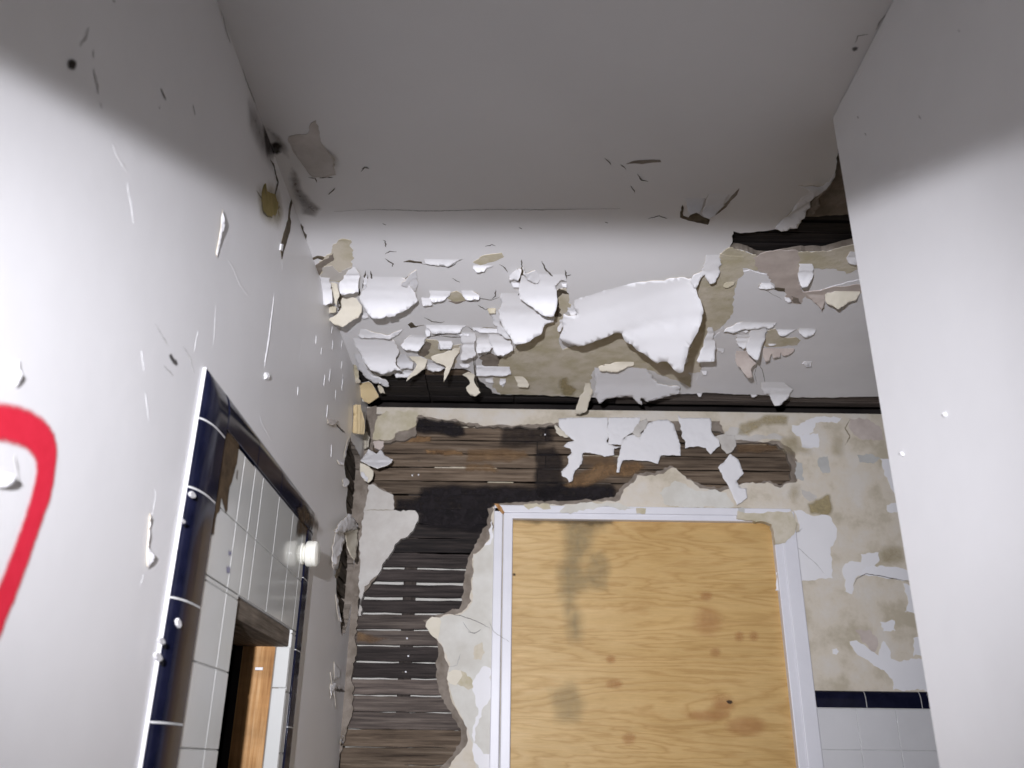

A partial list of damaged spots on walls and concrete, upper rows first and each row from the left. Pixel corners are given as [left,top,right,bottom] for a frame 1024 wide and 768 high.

water stain [253,119,281,154]
peeling [280,121,336,195]
water stain [396,419,643,532]
spalling [313,239,881,768]
peeling [140,513,156,586]